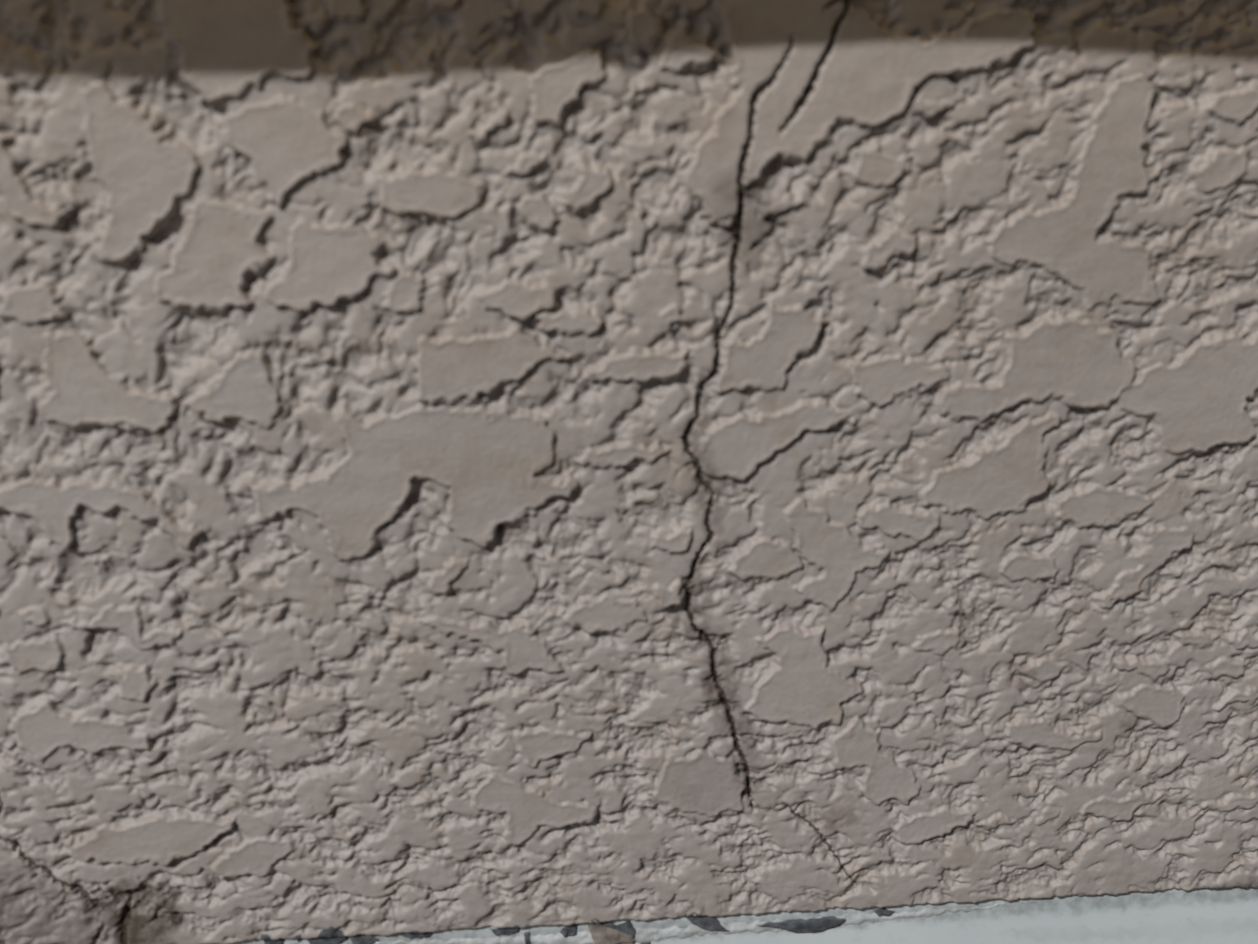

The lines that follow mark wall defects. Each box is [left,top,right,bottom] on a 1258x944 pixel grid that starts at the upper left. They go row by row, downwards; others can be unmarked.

crack [682,0,856,883]